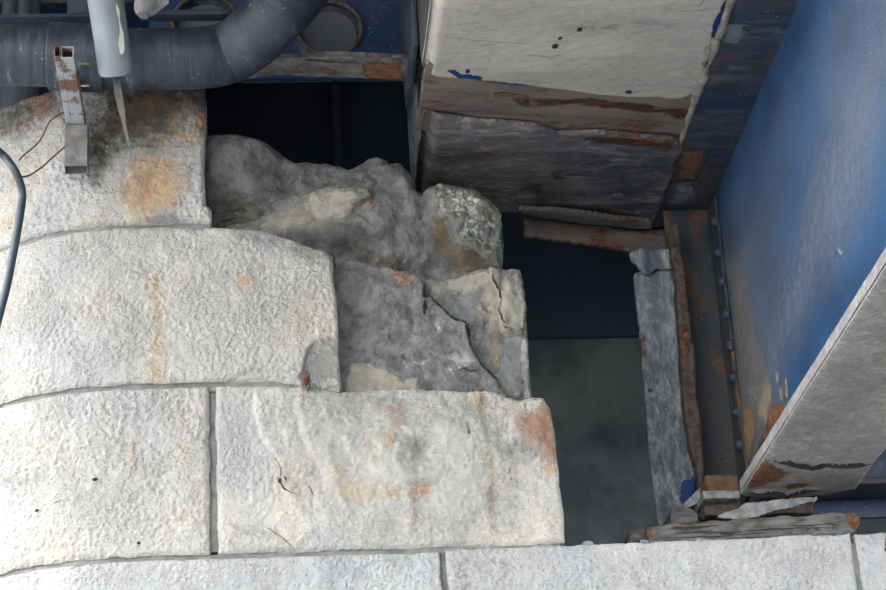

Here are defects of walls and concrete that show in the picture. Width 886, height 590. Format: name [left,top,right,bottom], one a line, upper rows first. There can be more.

corrosion [363,62,404,80]
peeling [447,69,535,87]
crack [424,282,500,384]
crack [492,269,513,333]
corrosion [667,223,704,491]
corrosion [742,381,807,489]
crack [272,455,314,495]